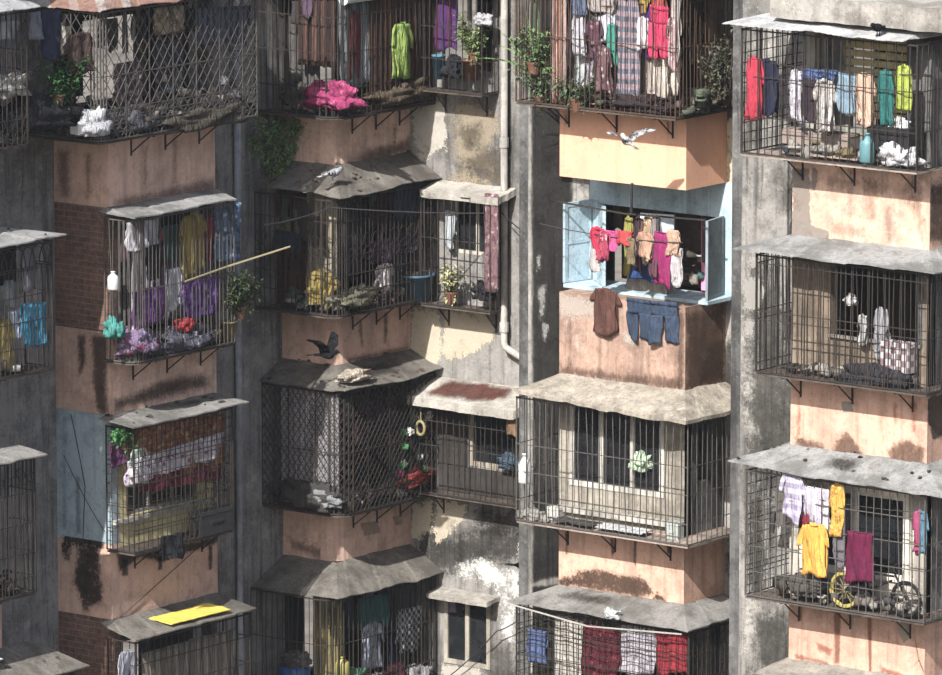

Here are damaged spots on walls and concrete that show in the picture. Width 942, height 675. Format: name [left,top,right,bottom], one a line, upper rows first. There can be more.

peeling [410,99,448,163]
peeling [792,168,829,239]
damp [531,94,731,389]
corrosion [430,381,511,401]
damp [533,397,559,511]
mould [61,536,104,610]
damp [532,525,665,603]
damp [534,606,569,631]
damp [534,661,554,675]